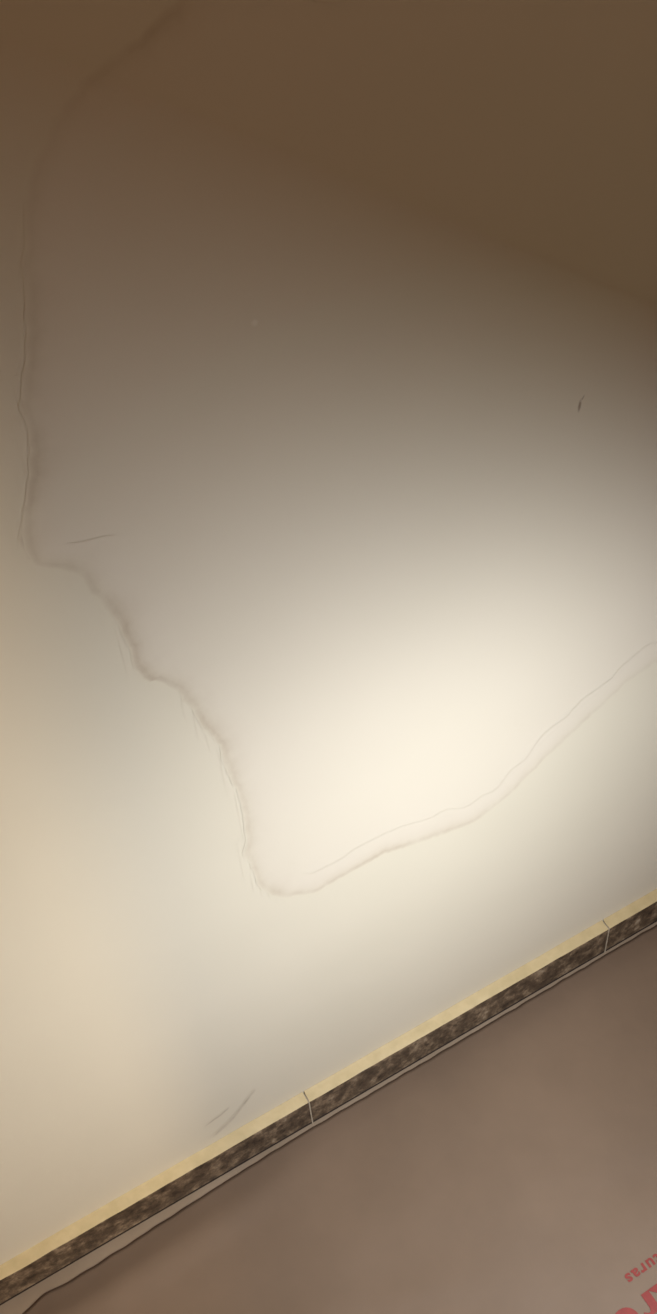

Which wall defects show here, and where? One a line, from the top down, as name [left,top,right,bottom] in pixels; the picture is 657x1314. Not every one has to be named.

water stain [7,0,657,903]